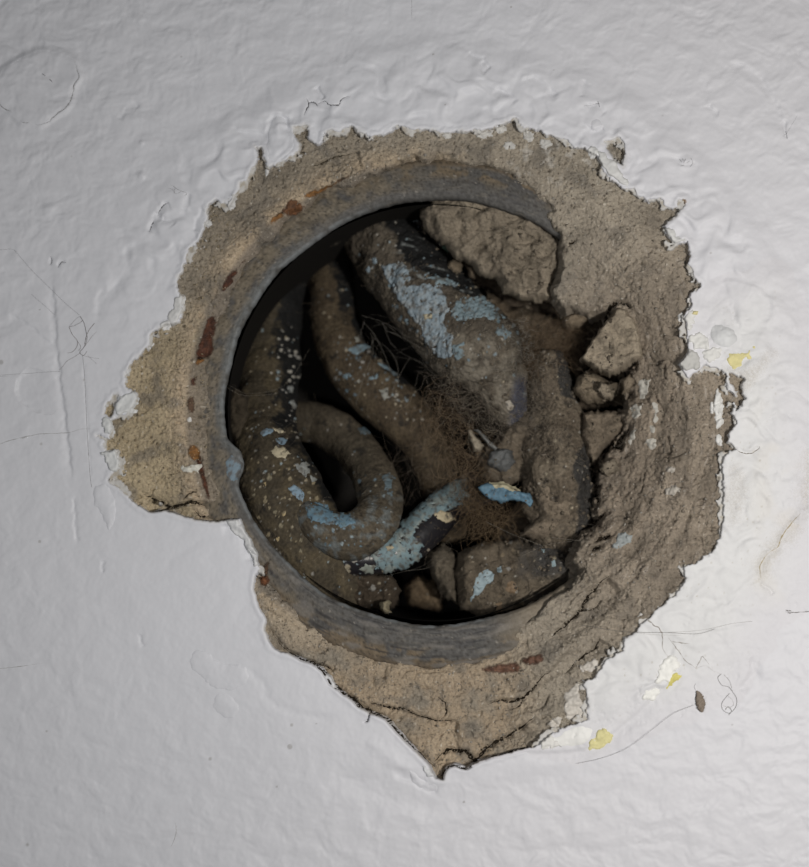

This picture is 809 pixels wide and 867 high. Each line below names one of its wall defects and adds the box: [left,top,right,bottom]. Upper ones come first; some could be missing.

corrosion [271,176,349,222]
corrosion [196,317,216,364]
spalling [100,122,809,779]
crack [553,576,609,636]
corrosion [482,654,543,673]
crack [275,637,600,775]